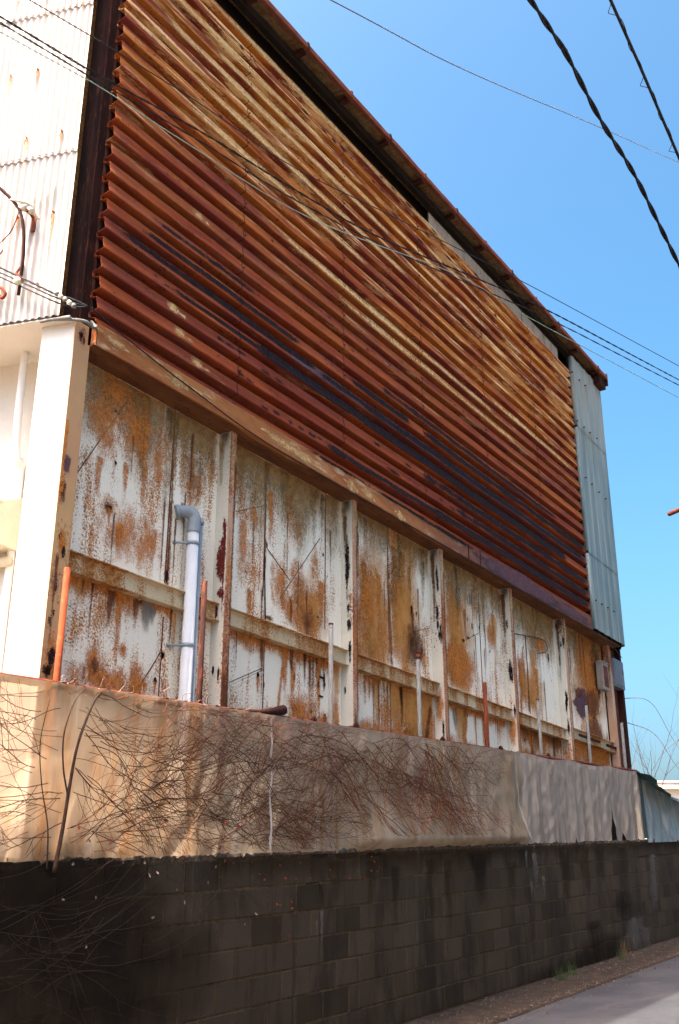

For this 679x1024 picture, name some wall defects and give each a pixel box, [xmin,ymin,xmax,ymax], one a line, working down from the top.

rust [65,575,176,695]
rust [84,373,206,585]
rust [220,446,340,724]
rust [353,520,611,766]